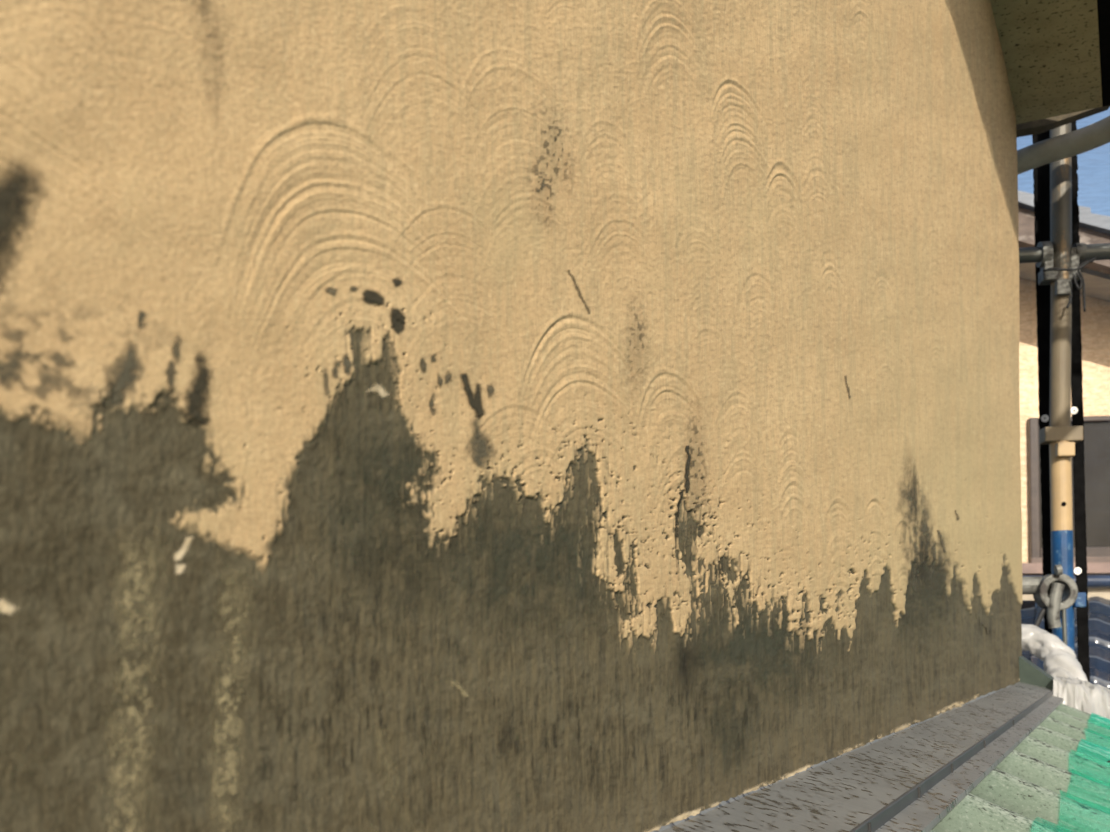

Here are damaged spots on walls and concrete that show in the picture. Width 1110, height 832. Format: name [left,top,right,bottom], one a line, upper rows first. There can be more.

damp [108,344,140,407]
damp [166,336,181,392]
damp [184,356,210,425]
damp [420,354,494,466]
damp [478,524,597,602]
damp [902,488,943,606]
damp [701,614,808,681]
damp [111,546,157,832]
damp [211,580,246,832]